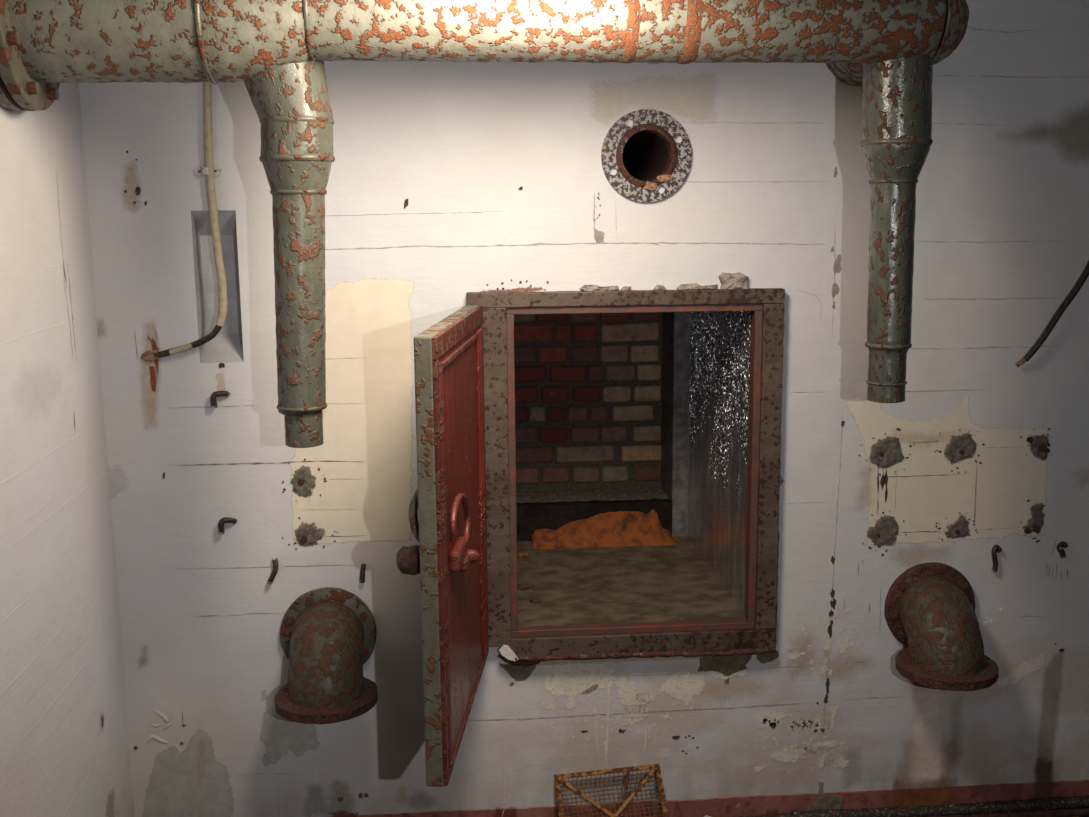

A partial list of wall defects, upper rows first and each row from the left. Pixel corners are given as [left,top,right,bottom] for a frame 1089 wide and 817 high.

corrosion [124,151,147,207]
corrosion [135,327,158,421]
peeling [282,278,414,550]
peeling [841,397,1053,556]
peeling [499,645,779,762]
peeling [750,658,849,811]
leakage [1036,669,1060,798]